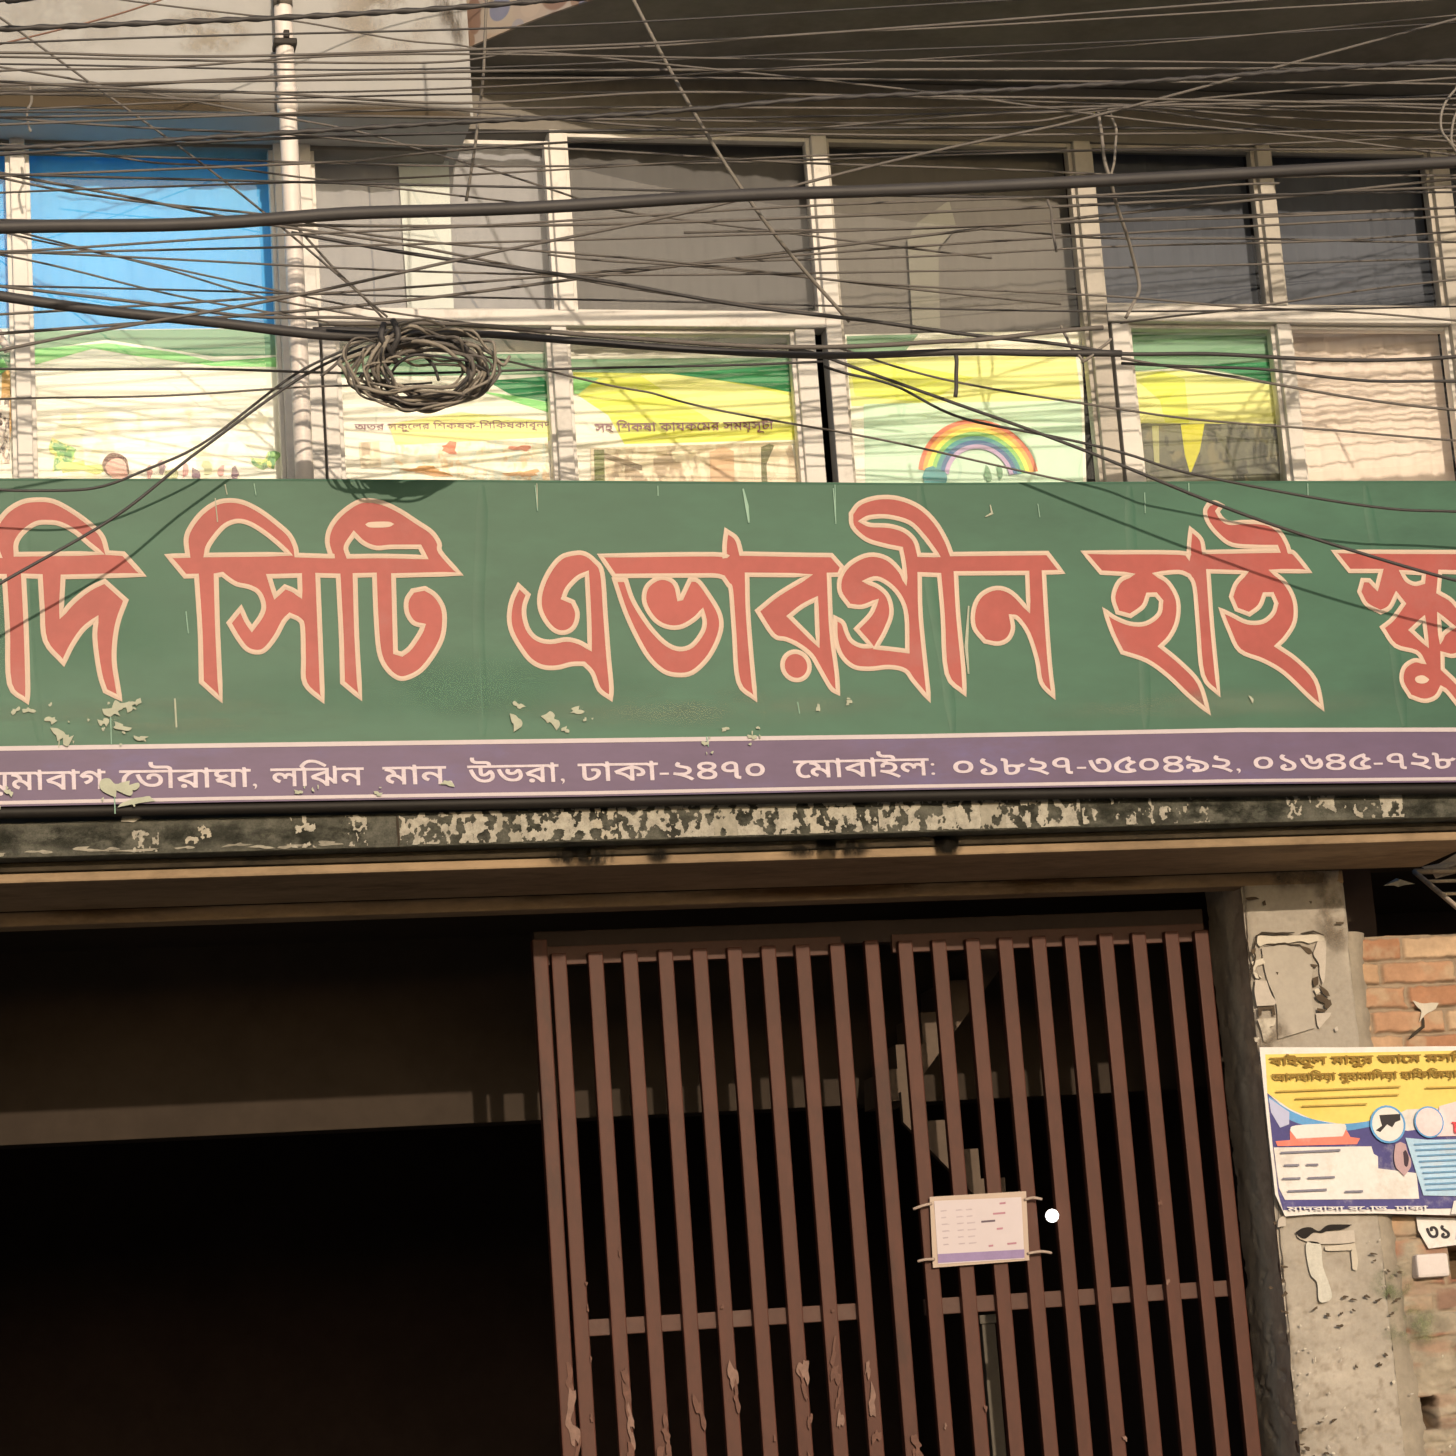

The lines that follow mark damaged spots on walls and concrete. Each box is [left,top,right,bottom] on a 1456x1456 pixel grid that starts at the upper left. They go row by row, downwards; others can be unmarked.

peeling [11,698,148,747]
peeling [510,701,526,731]
peeling [541,706,593,733]
peeling [73,778,368,853]
peeling [399,797,1210,845]
peeling [1286,795,1404,819]
peeling [1251,922,1344,1043]